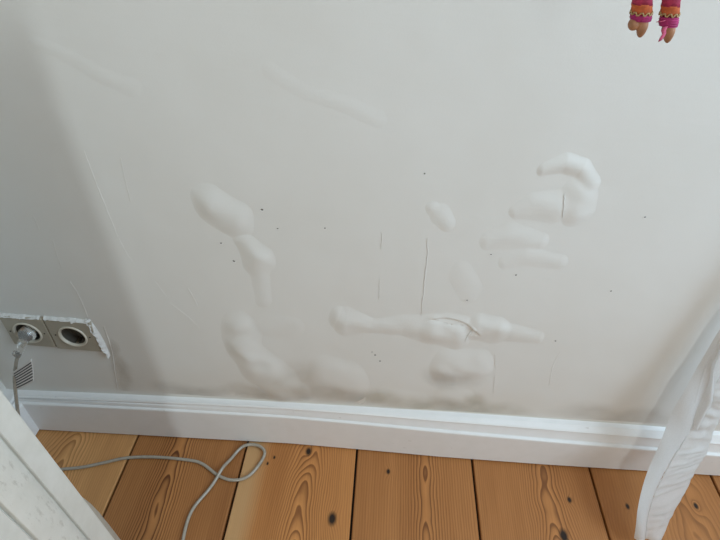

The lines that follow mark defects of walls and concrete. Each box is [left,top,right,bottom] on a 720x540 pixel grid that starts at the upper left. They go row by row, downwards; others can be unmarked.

peeling [0,313,110,358]